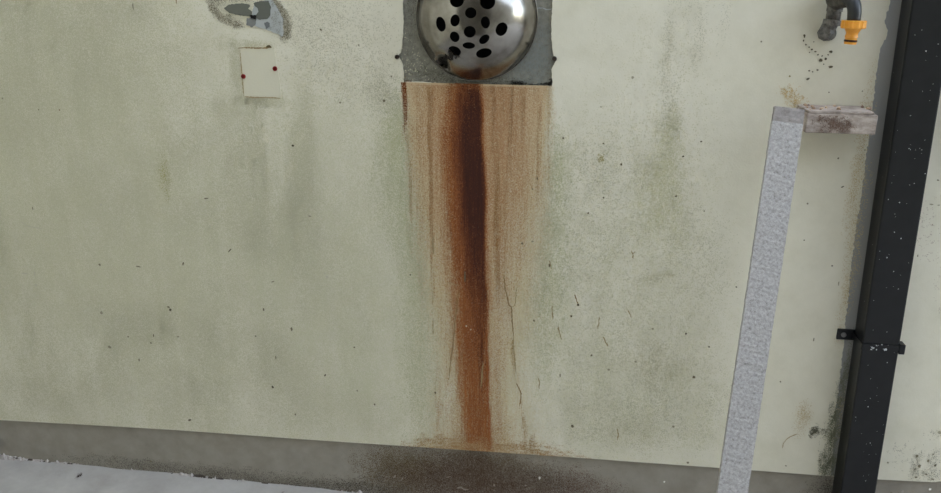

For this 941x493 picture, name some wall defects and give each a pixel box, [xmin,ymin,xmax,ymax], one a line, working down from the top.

peeling [208,0,260,28]
peeling [266,0,294,48]
water stain [818,340,854,476]